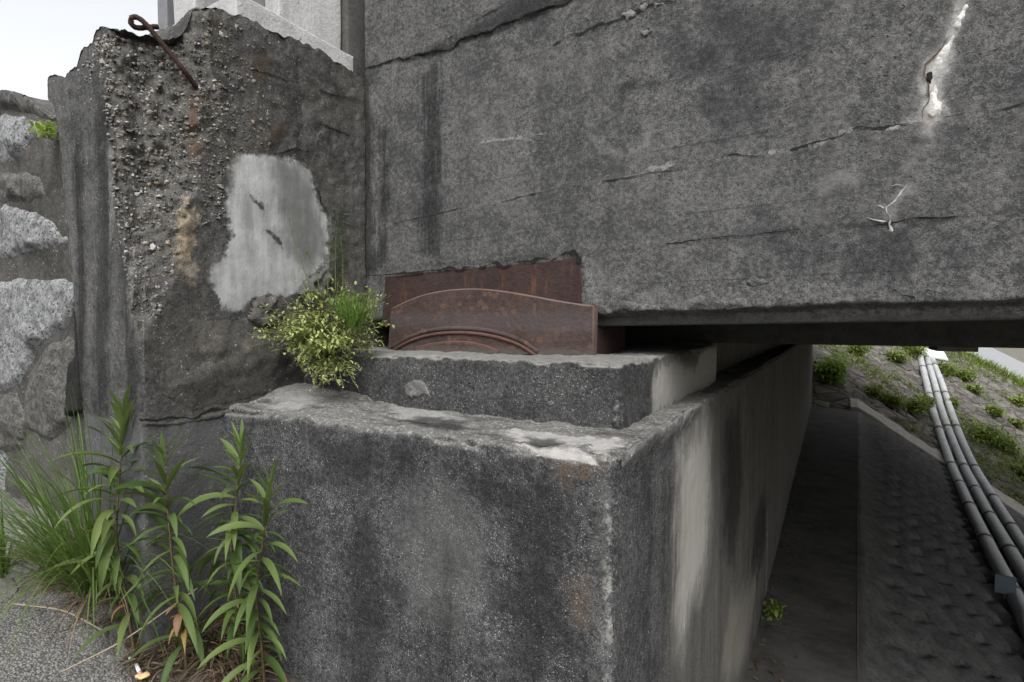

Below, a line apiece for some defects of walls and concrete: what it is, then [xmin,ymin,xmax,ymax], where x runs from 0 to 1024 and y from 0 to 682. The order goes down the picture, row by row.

crack [364,0,571,70]
leakage [922,4,969,121]
crack [790,103,1024,150]
spalling [69,14,280,322]
crack [604,153,765,181]
crack [667,229,798,244]
crack [867,216,960,227]
spalling [297,264,334,307]
spalling [247,296,285,329]
crack [138,407,230,427]
leakage [675,420,710,640]
leakage [723,578,755,678]